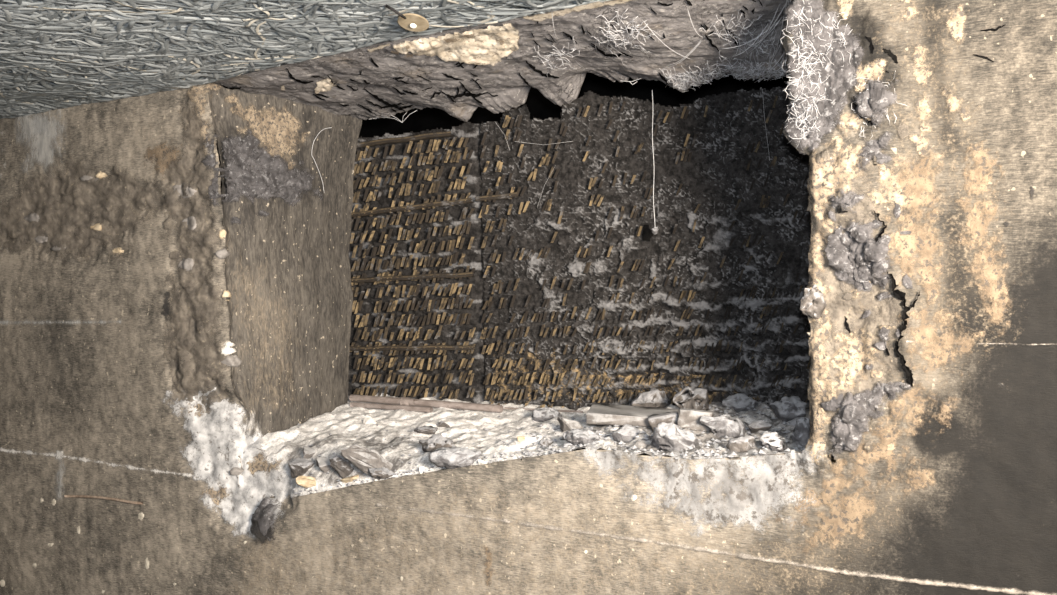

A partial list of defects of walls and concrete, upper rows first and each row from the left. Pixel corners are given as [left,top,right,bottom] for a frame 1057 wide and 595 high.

peeling [524,0,632,21]
spalling [367,23,519,66]
spalling [314,78,335,94]
spalling [577,73,789,108]
spalling [358,87,563,139]
crack [873,210,887,242]
damp [954,141,1011,324]
crack [885,272,920,388]
damp [777,154,983,552]
peeling [246,453,283,475]